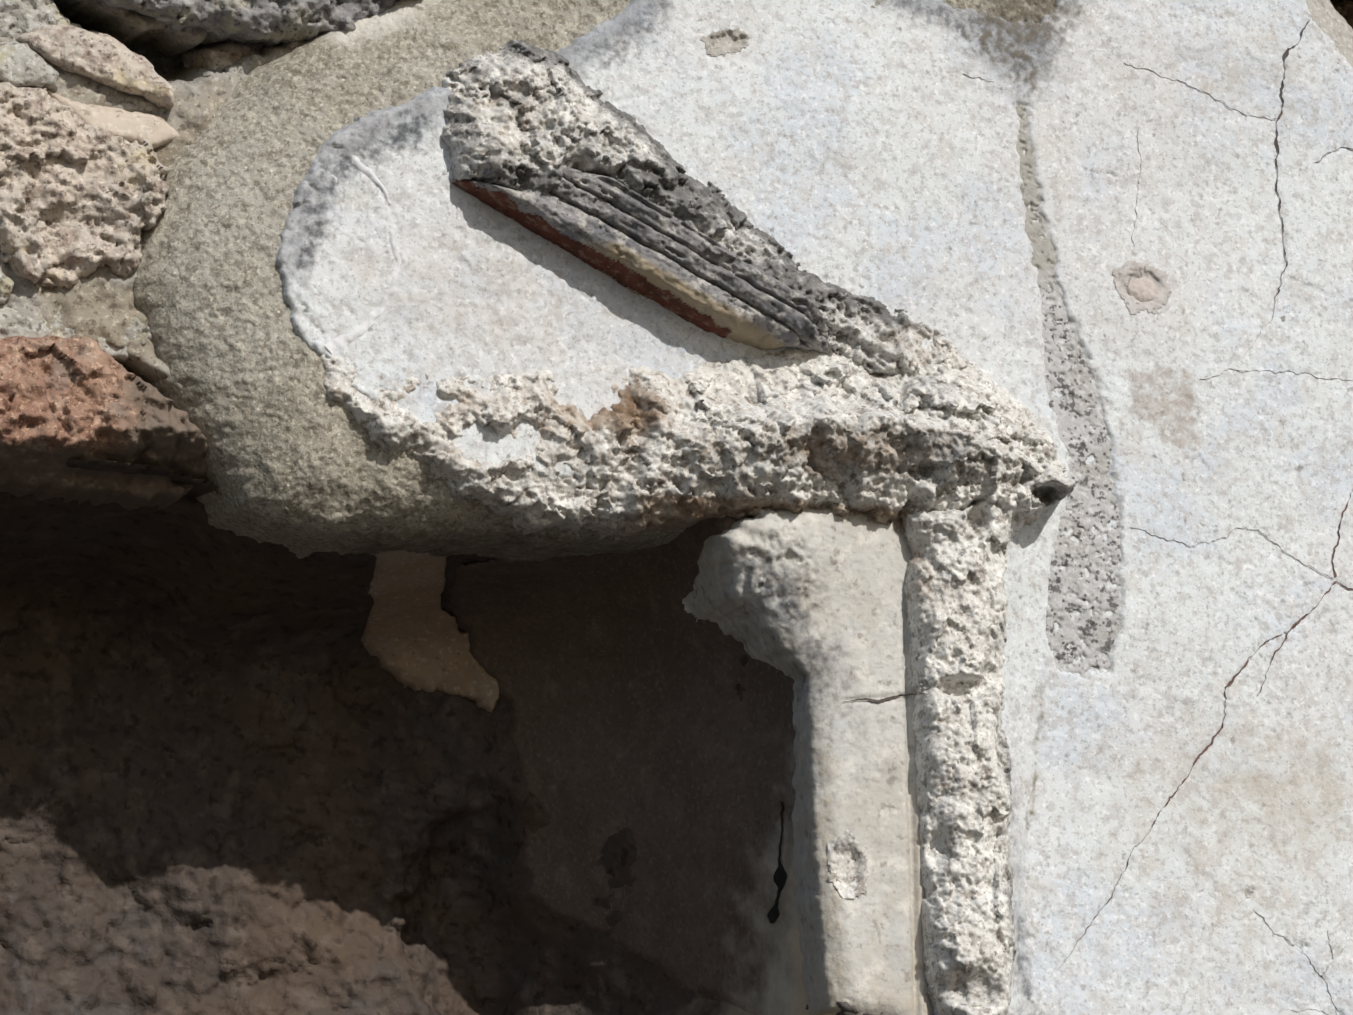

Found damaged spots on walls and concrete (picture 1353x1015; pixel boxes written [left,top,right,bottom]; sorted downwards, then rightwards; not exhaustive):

crack [1126,20,1351,381]
crack [1061,491,1353,966]
crack [1254,911,1343,1013]